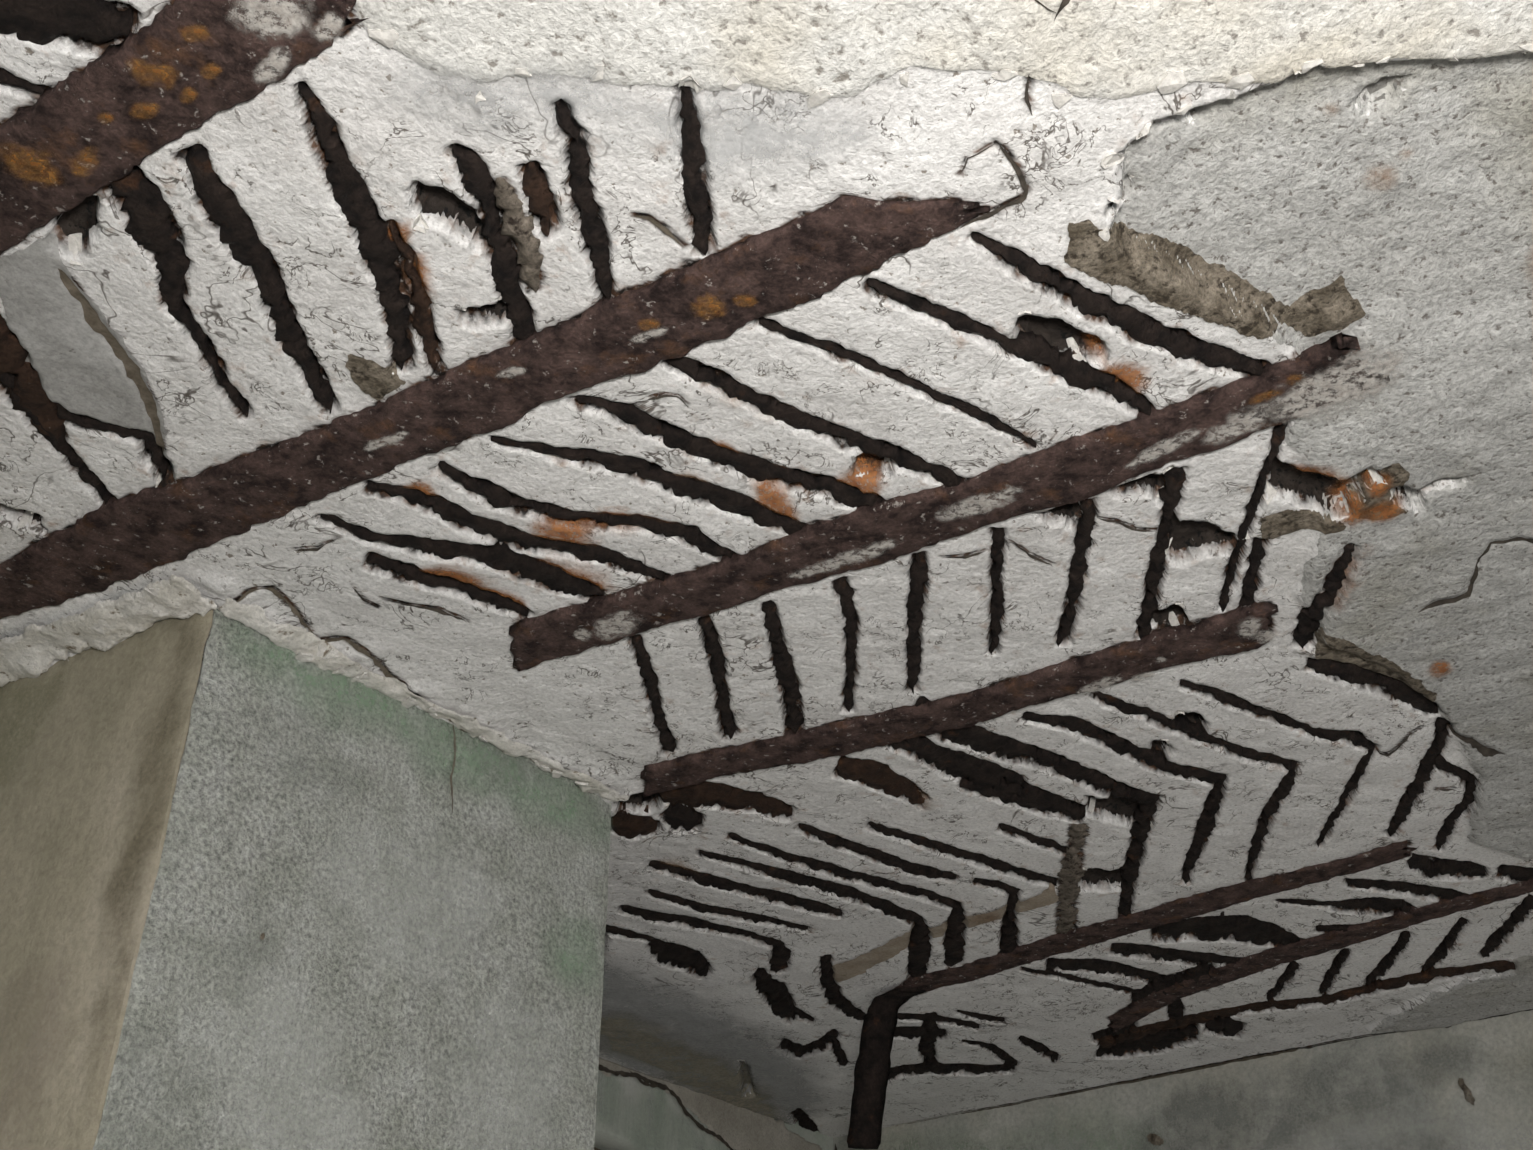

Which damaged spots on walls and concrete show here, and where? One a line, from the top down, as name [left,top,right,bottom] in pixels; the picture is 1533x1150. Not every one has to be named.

peeling [0,195,173,488]
rust [1085,334,1103,351]
spalling [345,0,1533,859]
rust [535,517,589,544]
rust [756,479,794,519]
rust [842,453,880,493]
rust [1295,466,1399,523]
crack [1418,537,1533,613]
spalling [1081,866,1123,885]
peeling [832,883,1059,982]
spalling [1371,955,1533,1034]
crack [598,1064,733,1150]